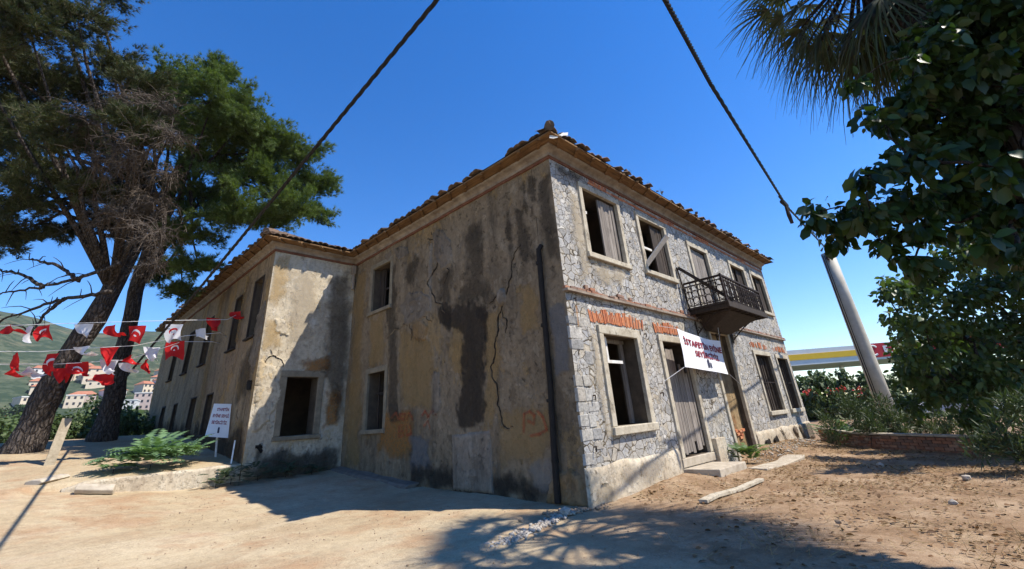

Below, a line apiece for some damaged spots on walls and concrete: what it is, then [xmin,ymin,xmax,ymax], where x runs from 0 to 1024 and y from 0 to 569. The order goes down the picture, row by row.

crack [385,233,449,339]
leakage [438,227,497,428]
crack [489,245,520,430]